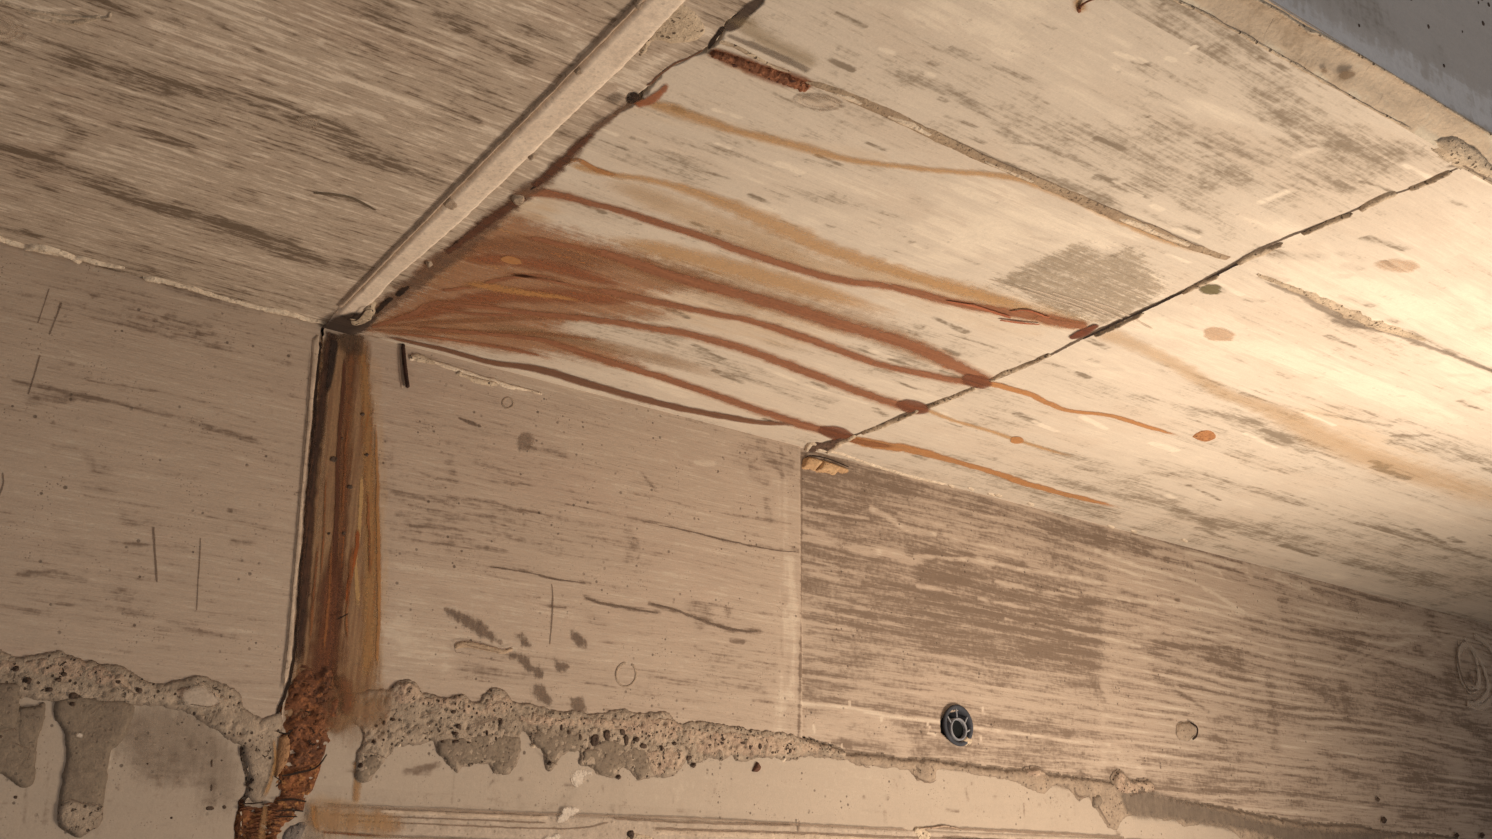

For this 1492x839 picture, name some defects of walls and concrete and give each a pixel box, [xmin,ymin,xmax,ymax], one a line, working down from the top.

crack [626,0,764,104]
corrosion [234,85,1172,839]
corrosion [1192,430,1216,442]
leakage [571,770,592,787]
leakage [545,807,579,839]
leakage [1123,782,1397,839]